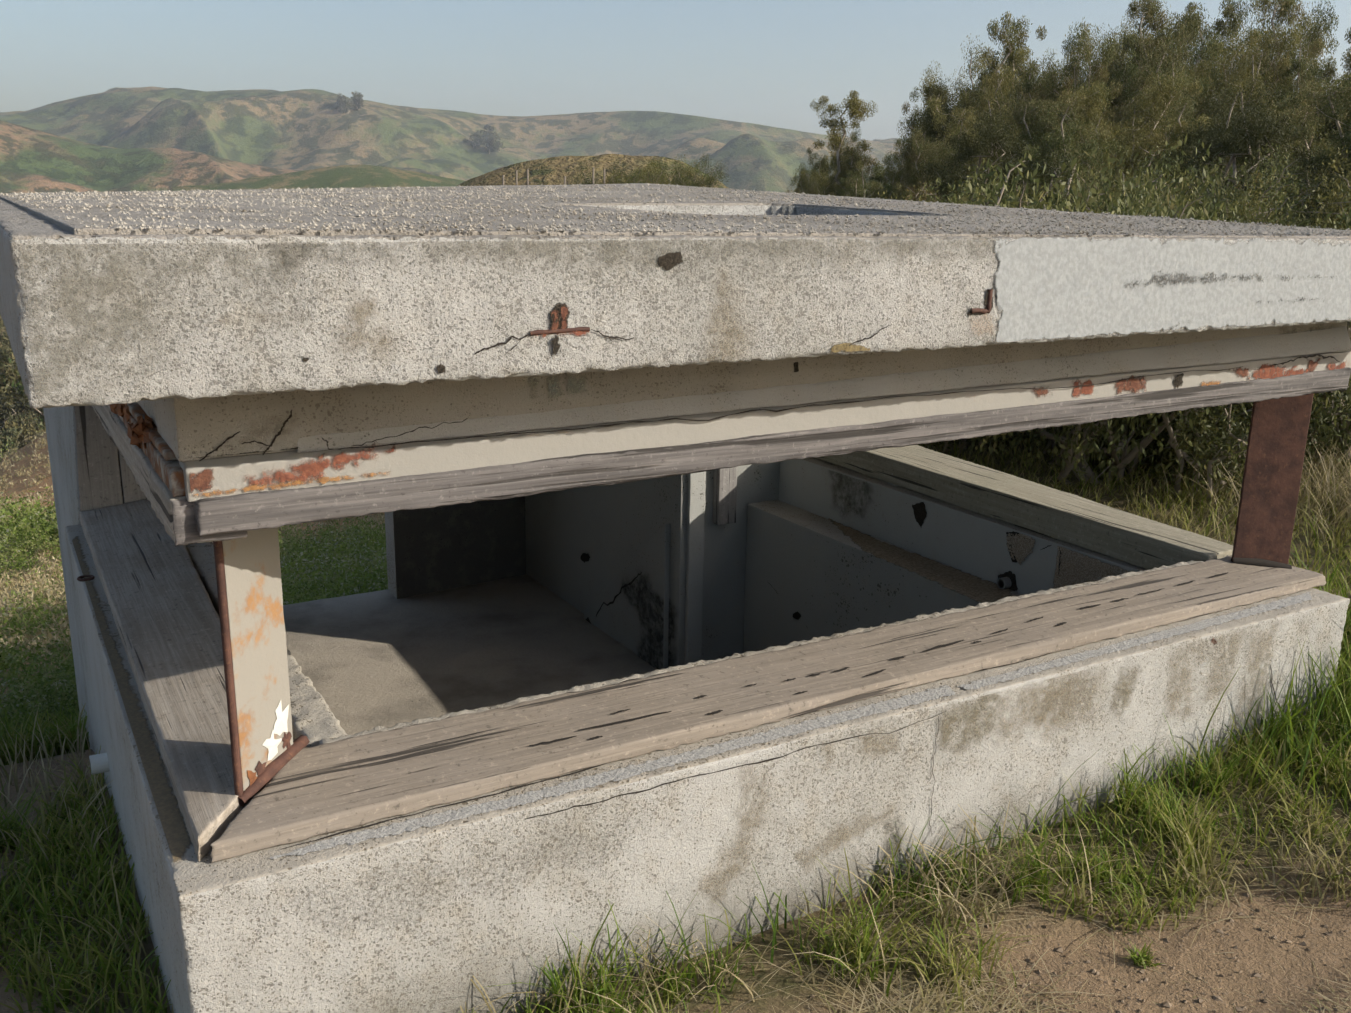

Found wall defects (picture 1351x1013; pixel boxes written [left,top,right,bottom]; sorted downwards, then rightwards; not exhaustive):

corrosion [969,288,993,316]
peeling [995,237,1351,342]
corrosion [530,303,590,355]
crack [591,329,633,342]
corrosion [110,404,154,449]
crack [199,410,292,461]
corrosion [189,444,395,496]
water stain [829,519,1012,603]
spalling [1053,546,1129,589]
water stain [622,576,674,670]
peeling [247,701,292,785]
water stain [943,695,992,747]